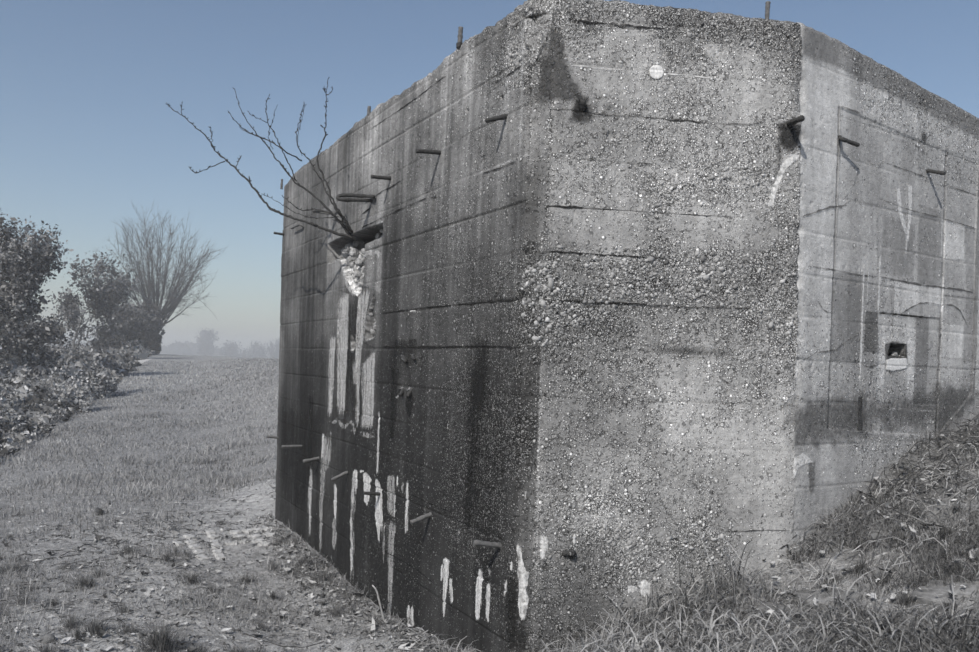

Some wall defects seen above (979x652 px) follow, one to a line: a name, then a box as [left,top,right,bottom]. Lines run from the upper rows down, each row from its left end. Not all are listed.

water stain [541,29,583,99]
peeling [328,229,383,438]